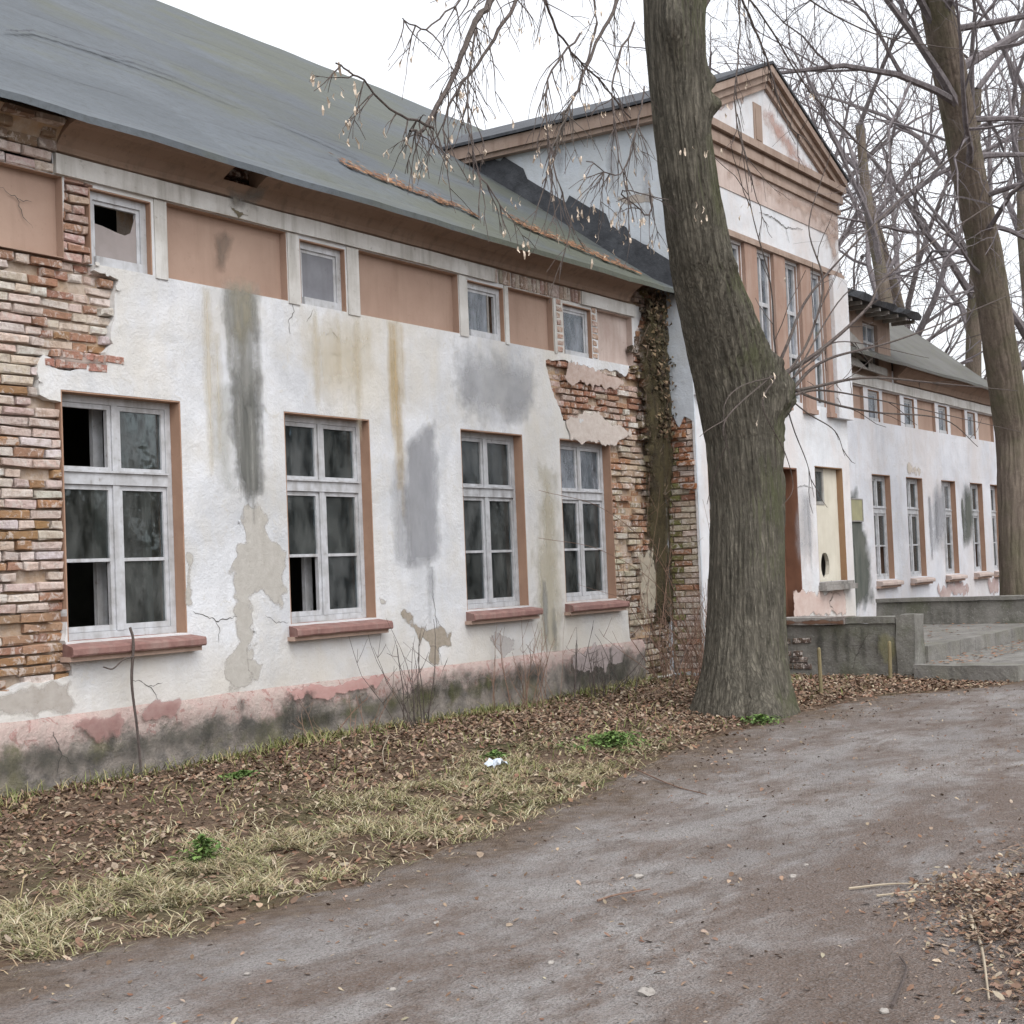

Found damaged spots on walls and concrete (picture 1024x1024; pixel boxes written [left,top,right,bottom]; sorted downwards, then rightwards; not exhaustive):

damp [228,286,261,497]
spalling [0,176,124,716]
damp [397,429,437,561]
spalling [546,285,703,678]
peeling [225,505,287,688]
peeling [401,610,451,665]
peeling [794,589,846,617]
damp [852,522,872,616]
damp [37,746,58,766]
peeling [76,713,124,742]
peeling [142,698,181,721]
peeling [287,674,384,700]